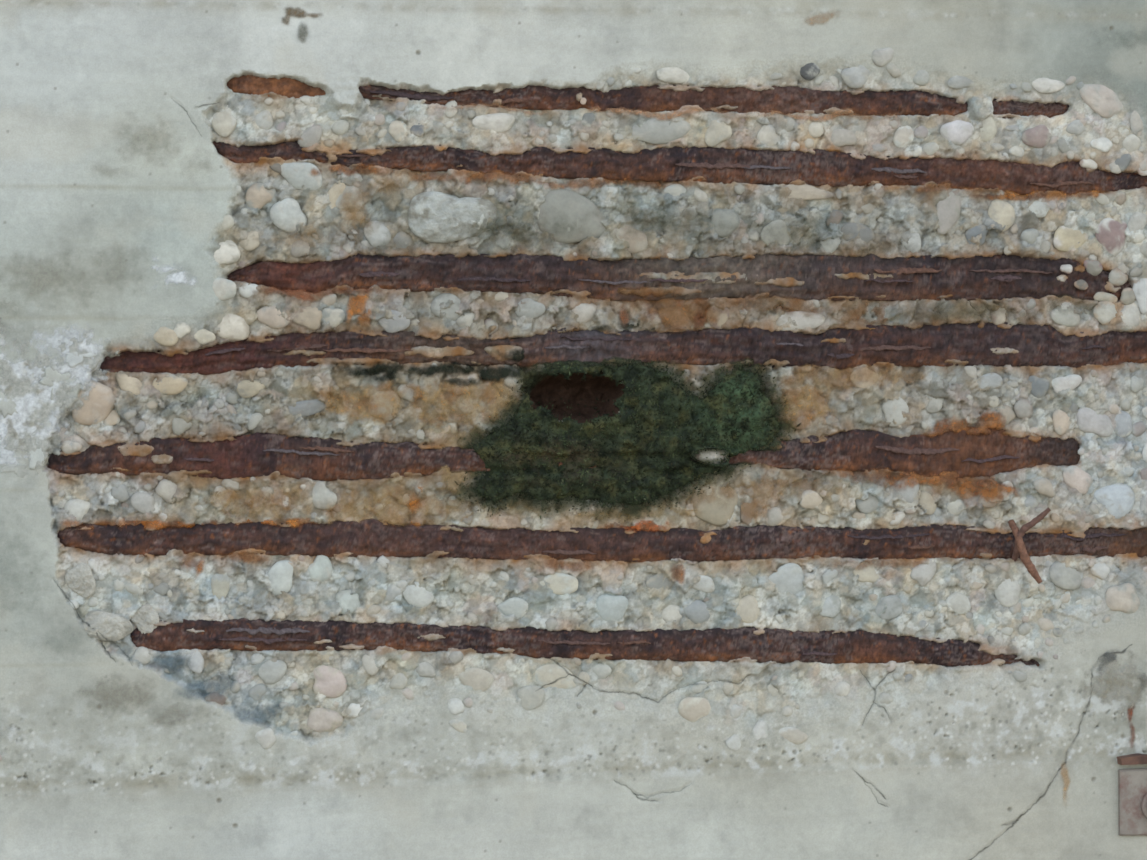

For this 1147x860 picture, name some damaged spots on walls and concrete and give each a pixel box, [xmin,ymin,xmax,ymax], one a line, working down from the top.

corrosion [312,164,384,175]
corrosion [978,189,1099,200]
spalling [0,48,1147,478]
leakage [26,329,83,382]
corrosion [925,412,1003,438]
corrosion [845,469,1016,499]
corrosion [101,520,218,529]
spalling [42,322,1147,753]
crack [970,762,1066,860]